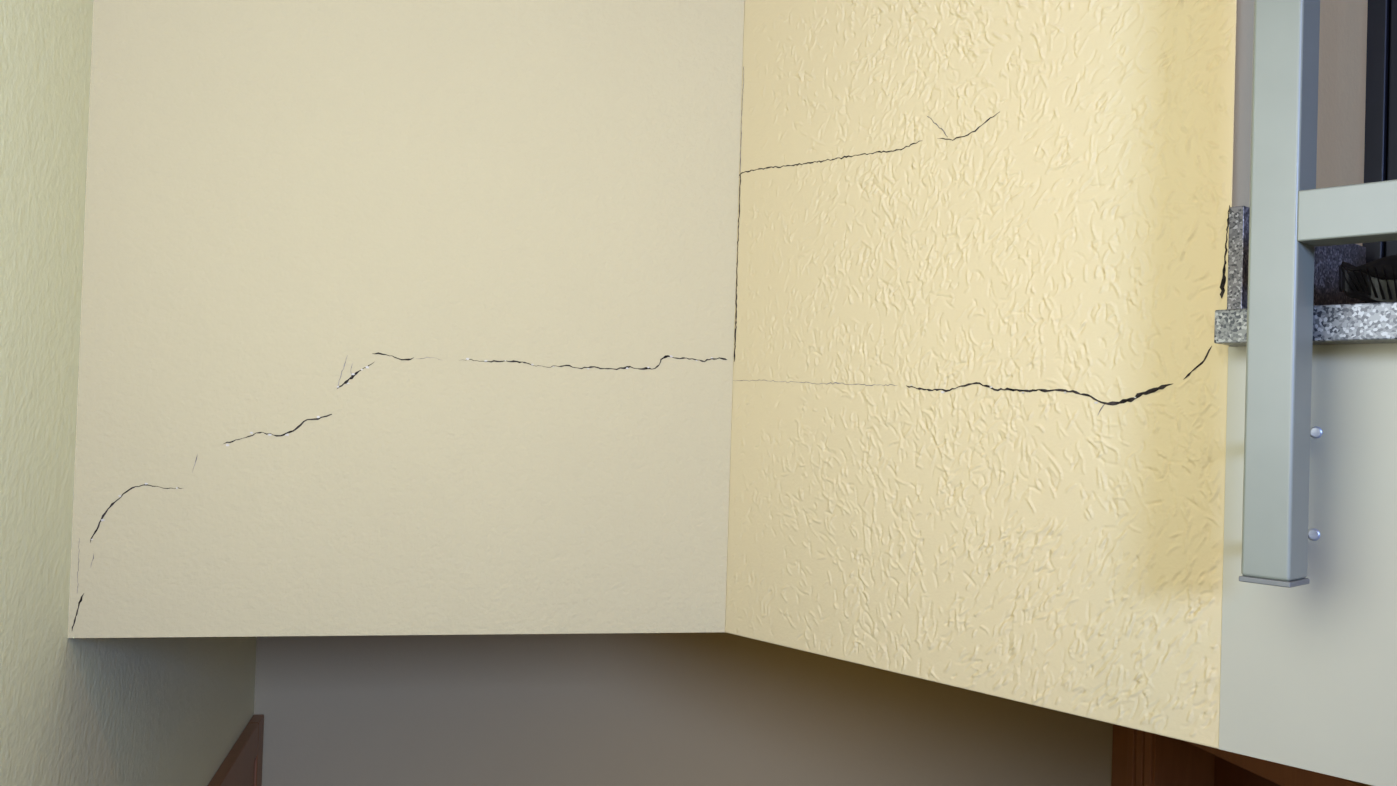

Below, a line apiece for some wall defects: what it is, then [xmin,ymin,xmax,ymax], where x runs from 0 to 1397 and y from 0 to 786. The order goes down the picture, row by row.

crack [72,67,1212,630]